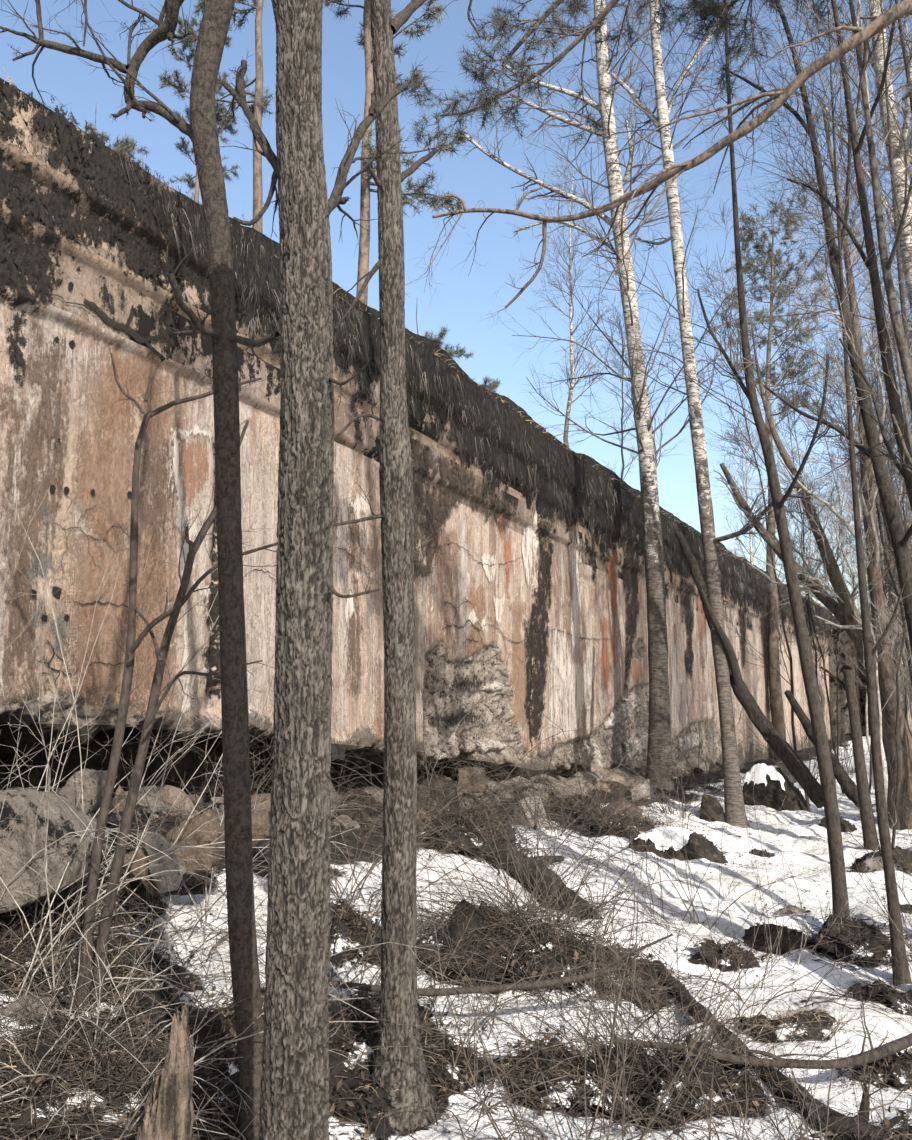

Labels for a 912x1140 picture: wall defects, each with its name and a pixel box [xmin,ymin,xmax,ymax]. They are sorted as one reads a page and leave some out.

water stain [0,80,221,713]
rust [177,437,209,502]
water stain [410,430,518,661]
peeling [466,593,505,630]
peeling [481,551,496,581]
peeling [522,511,539,586]
water stain [506,514,607,747]
rust [600,554,618,689]
water stain [621,536,642,697]
spalling [343,746,384,765]
spalling [417,641,649,777]